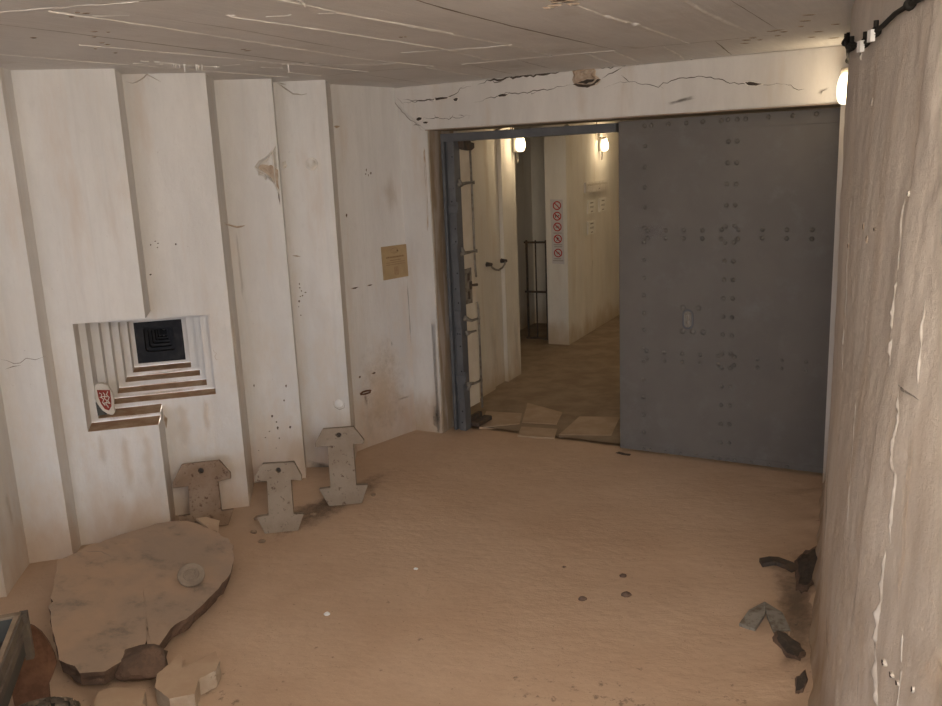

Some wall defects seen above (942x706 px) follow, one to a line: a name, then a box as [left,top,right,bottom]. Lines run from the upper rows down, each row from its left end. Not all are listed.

crack [395,72,567,125]
spalling [255,146,287,202]